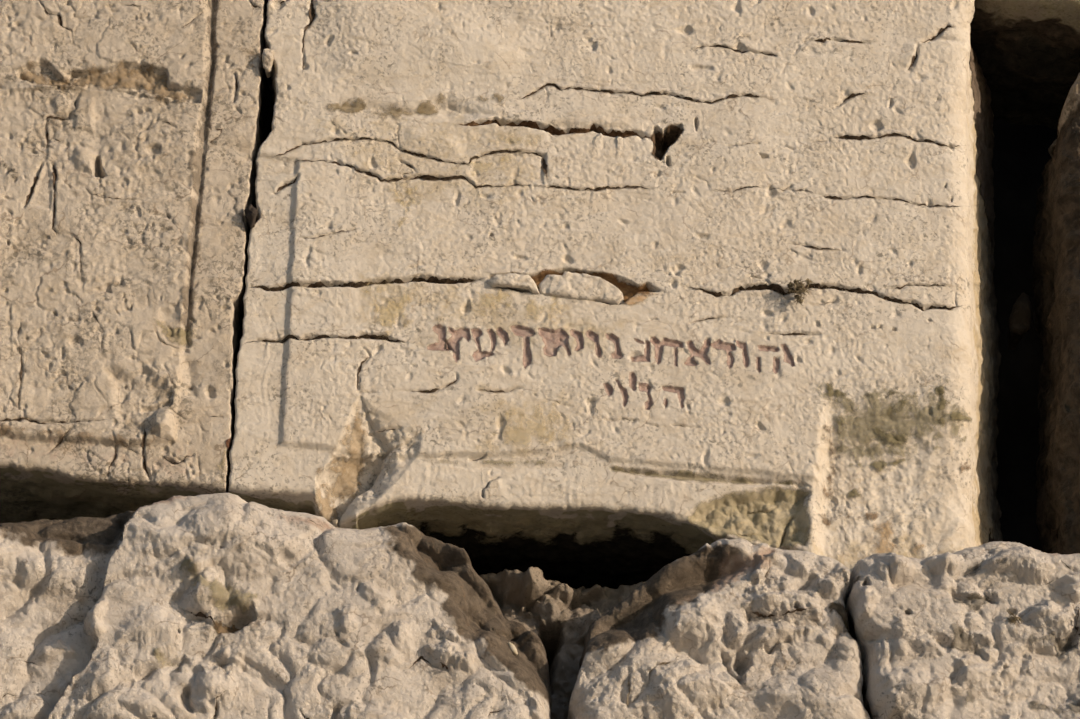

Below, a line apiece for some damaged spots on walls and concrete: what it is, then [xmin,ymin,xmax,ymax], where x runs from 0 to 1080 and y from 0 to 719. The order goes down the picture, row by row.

crack [694,35,875,56]
crack [274,83,772,194]
crack [788,133,966,148]
crack [705,180,969,207]
crack [254,276,487,292]
crack [683,276,964,321]
water stain [827,383,846,399]
water stain [935,386,972,424]
water stain [873,427,907,445]
water stain [849,459,906,471]